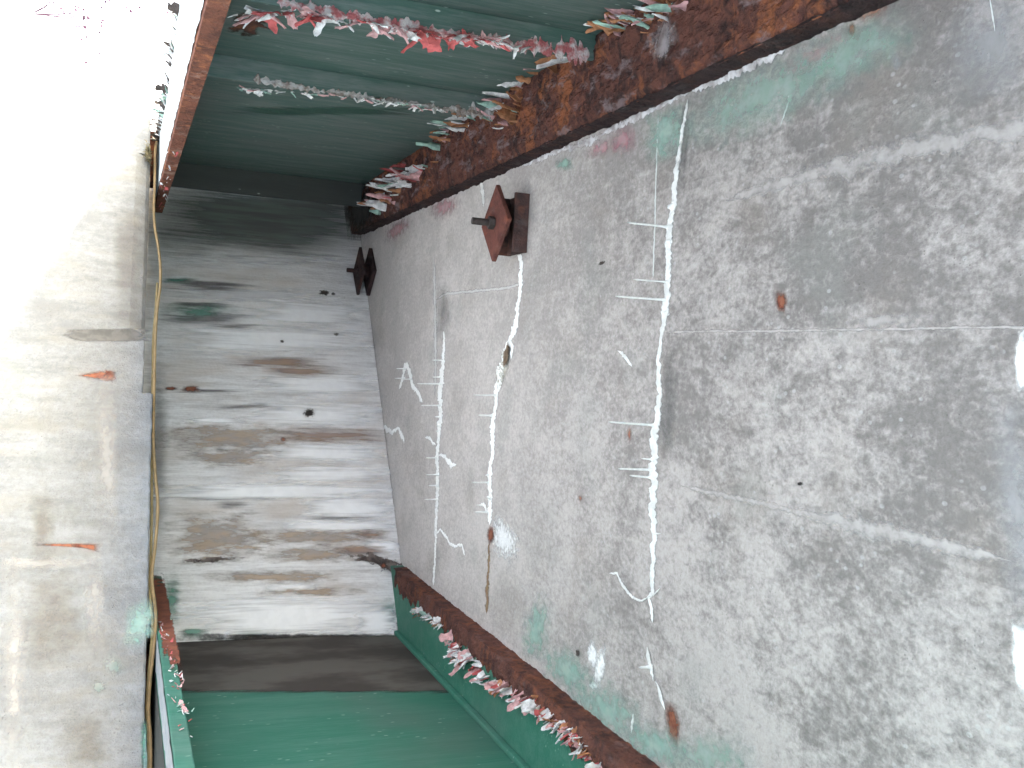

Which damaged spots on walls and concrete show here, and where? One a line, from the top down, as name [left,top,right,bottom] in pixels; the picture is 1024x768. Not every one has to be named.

rust [155,0,269,212]
peeling [227,0,688,215]
rust [354,0,898,234]
spalling [522,49,785,166]
water stain [157,191,358,263]
water stain [166,445,393,530]
water stain [193,373,376,424]
crack [384,254,523,585]
crack [609,99,688,710]
water stain [197,585,394,641]
peeling [409,606,602,768]
rust [394,567,660,768]